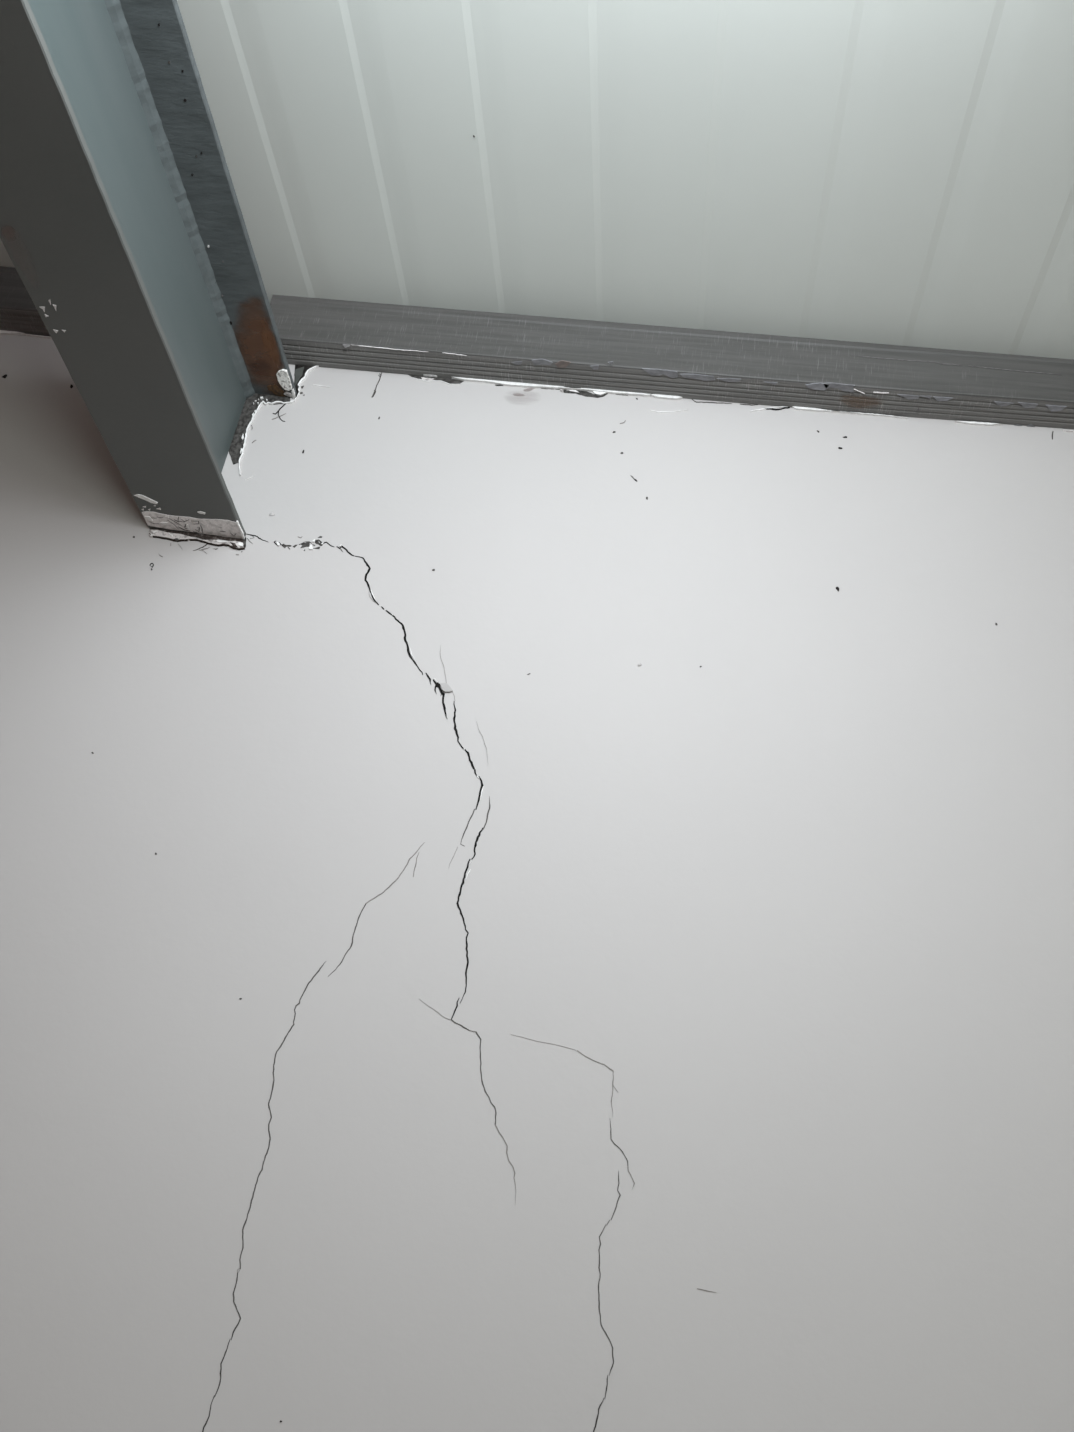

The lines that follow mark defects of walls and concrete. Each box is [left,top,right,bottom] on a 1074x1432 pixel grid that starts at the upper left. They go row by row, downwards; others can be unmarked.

rust [237,299,287,397]
crack [202,542,516,1432]
crack [515,1035,635,1432]